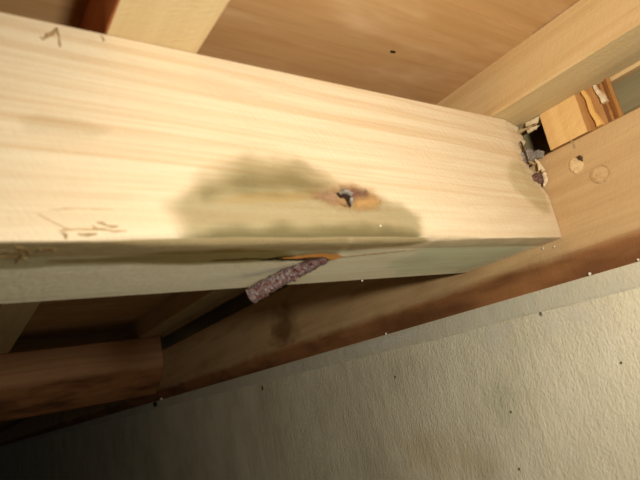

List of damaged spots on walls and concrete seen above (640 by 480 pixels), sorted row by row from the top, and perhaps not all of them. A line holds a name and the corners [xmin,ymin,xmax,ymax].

spalling [525,116,540,134]
spalling [520,141,548,187]
corrosion [321,187,378,208]
crack [211,254,315,262]